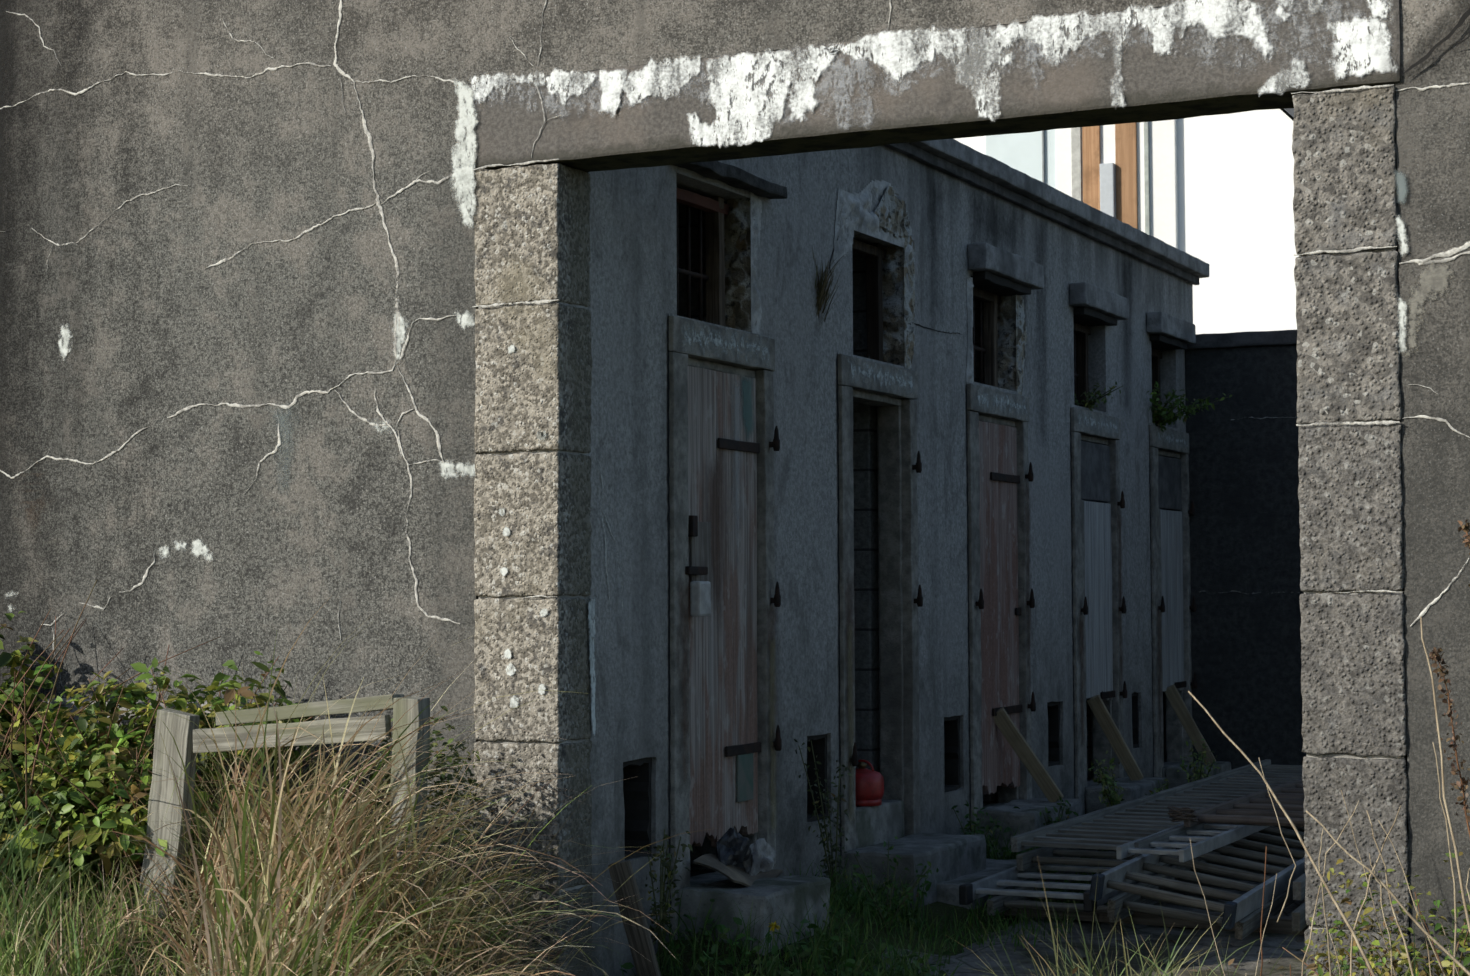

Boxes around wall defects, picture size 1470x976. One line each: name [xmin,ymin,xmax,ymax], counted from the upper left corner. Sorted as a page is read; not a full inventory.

peeling [472,0,1397,147]
crack [0,0,460,624]
crack [1399,241,1470,265]
crack [1402,384,1470,438]
crack [41,549,156,685]
crack [1410,558,1469,627]